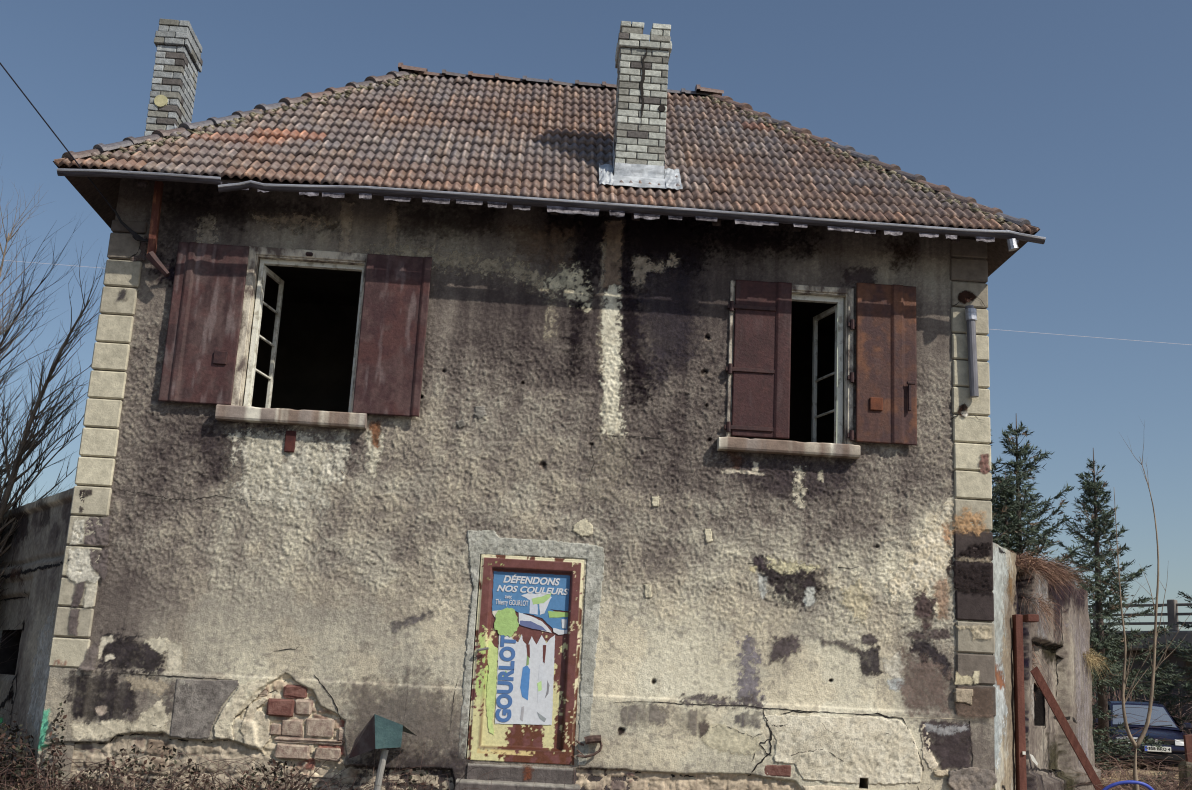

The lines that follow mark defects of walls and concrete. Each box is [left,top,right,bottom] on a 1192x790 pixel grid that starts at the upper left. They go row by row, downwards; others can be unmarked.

crack [639,48,647,123]
damp [196,213,219,244]
damp [253,200,354,253]
damp [364,203,822,497]
damp [229,425,350,512]
flaking render [885,497,957,620]
spalling [69,635,455,790]
crack [617,701,973,790]
peeling [947,546,1008,790]